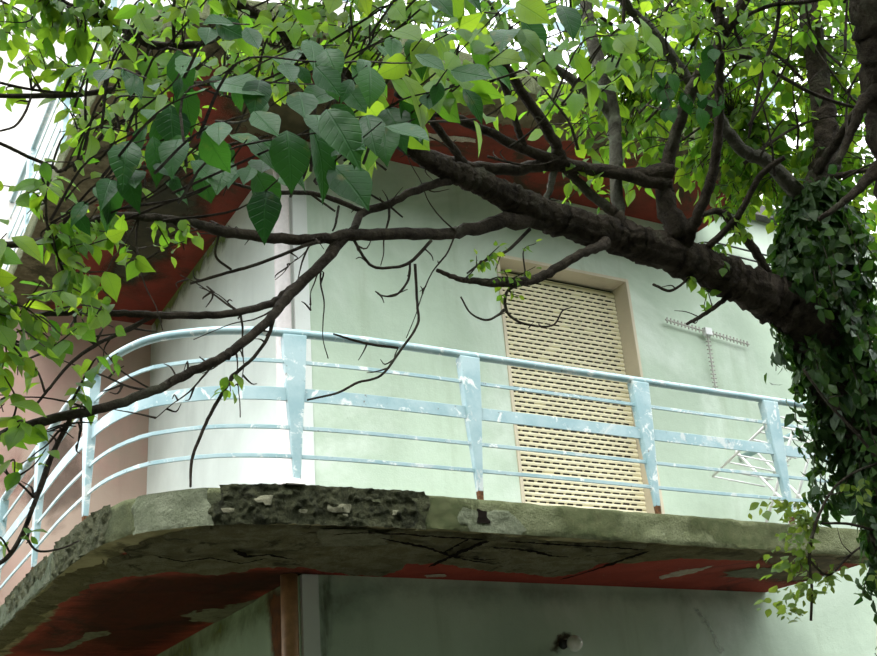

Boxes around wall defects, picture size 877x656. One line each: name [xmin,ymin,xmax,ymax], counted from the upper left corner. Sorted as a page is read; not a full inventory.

crack [157,549,289,564]
spalling [0,477,778,652]
crack [336,532,649,580]